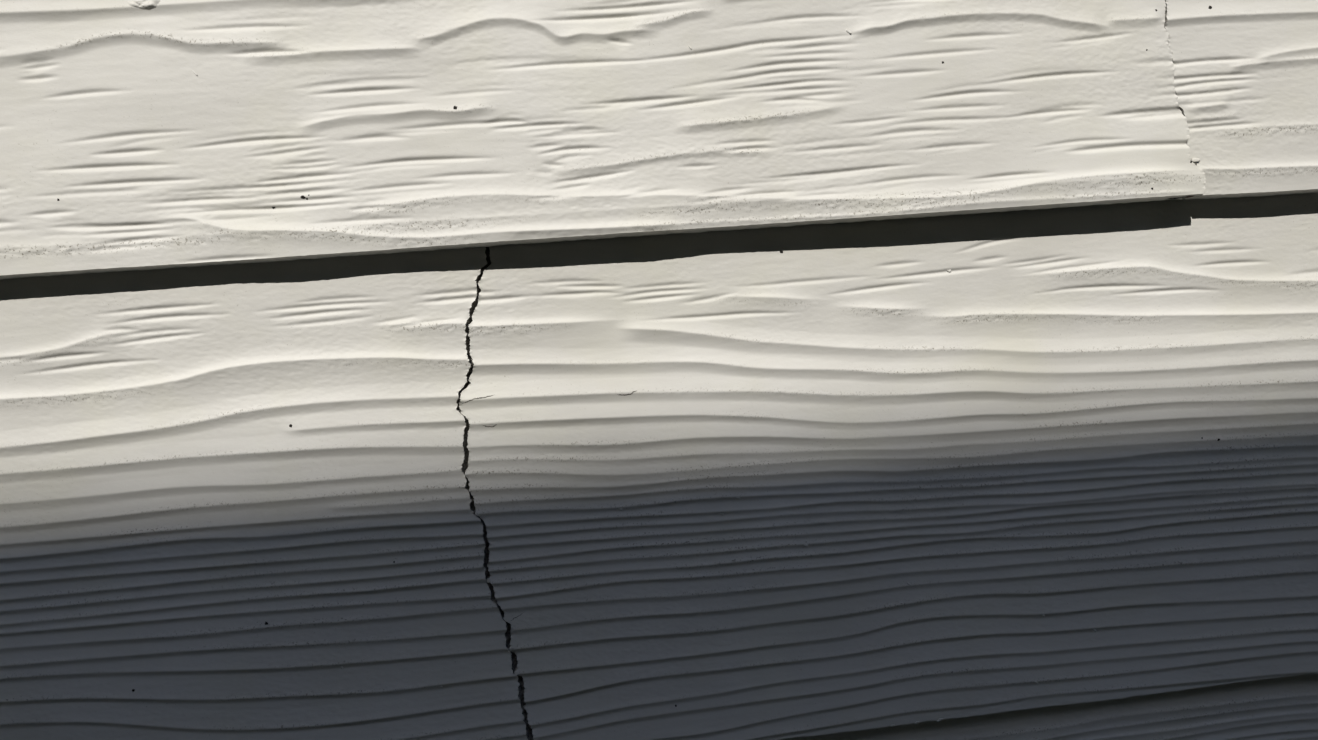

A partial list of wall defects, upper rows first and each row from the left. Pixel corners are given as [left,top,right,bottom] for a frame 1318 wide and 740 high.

crack [456,247,534,740]